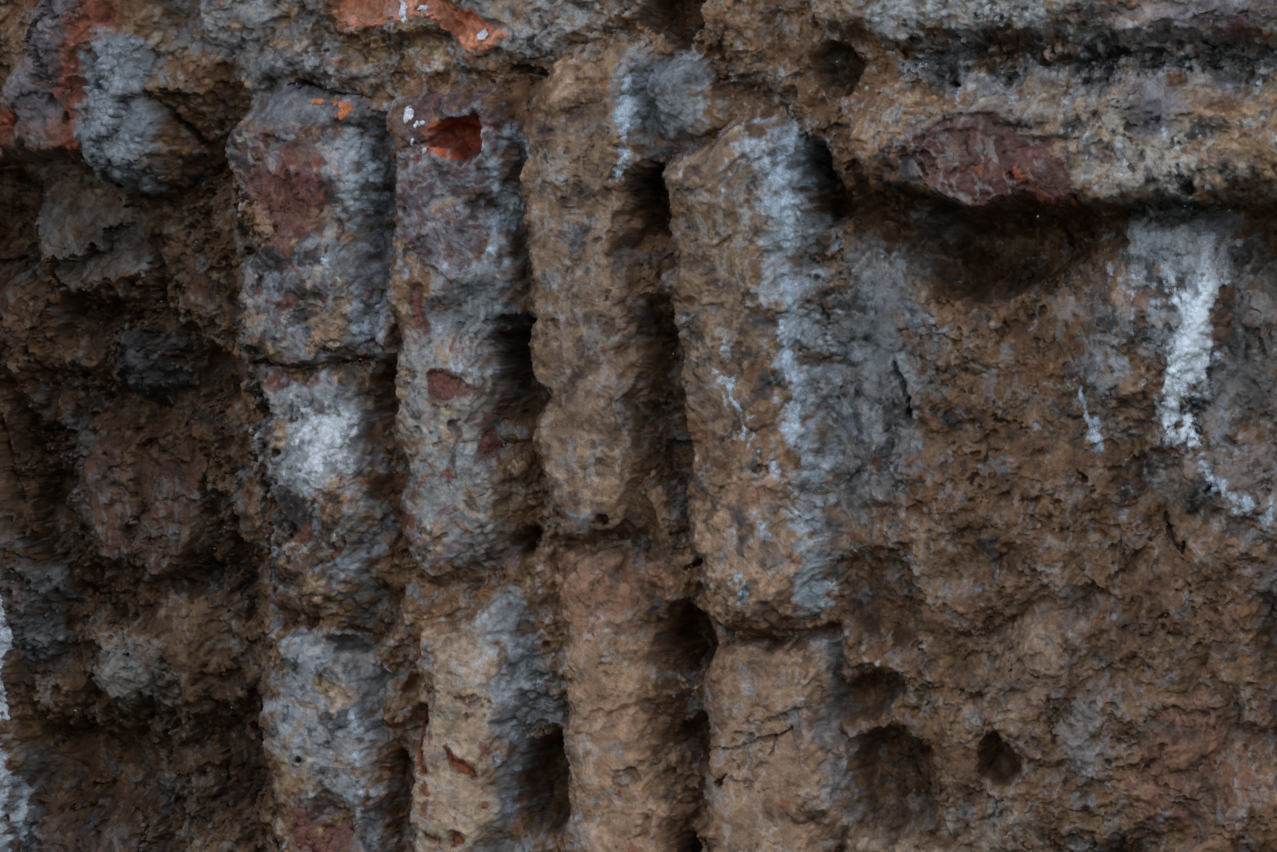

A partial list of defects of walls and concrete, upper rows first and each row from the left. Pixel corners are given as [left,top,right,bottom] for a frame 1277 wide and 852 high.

spalling [324,0,515,49]
spalling [418,109,485,169]